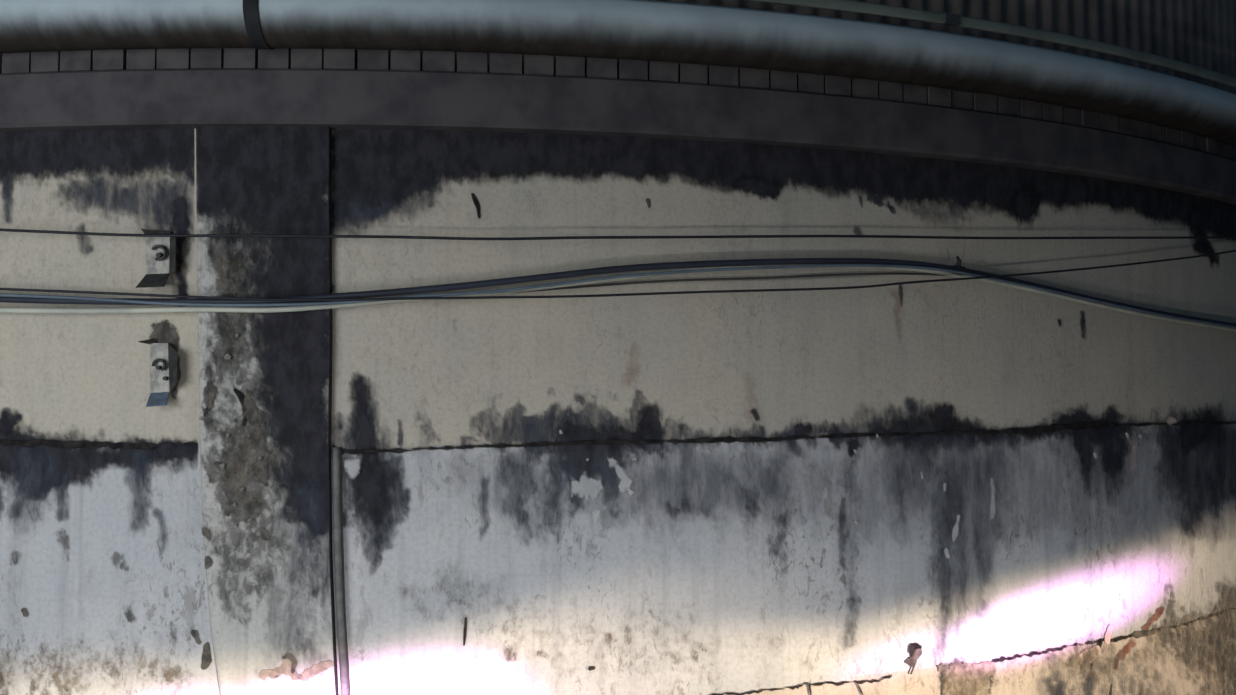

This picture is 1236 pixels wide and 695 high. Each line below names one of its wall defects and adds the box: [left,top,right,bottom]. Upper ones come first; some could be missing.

water stain [0,126,1236,613]
crack [342,419,1236,455]
crack [461,617,469,646]
peeling [1079,625,1113,663]
crack [993,608,1236,695]
crack [711,674,892,695]
flaking render [938,658,996,695]